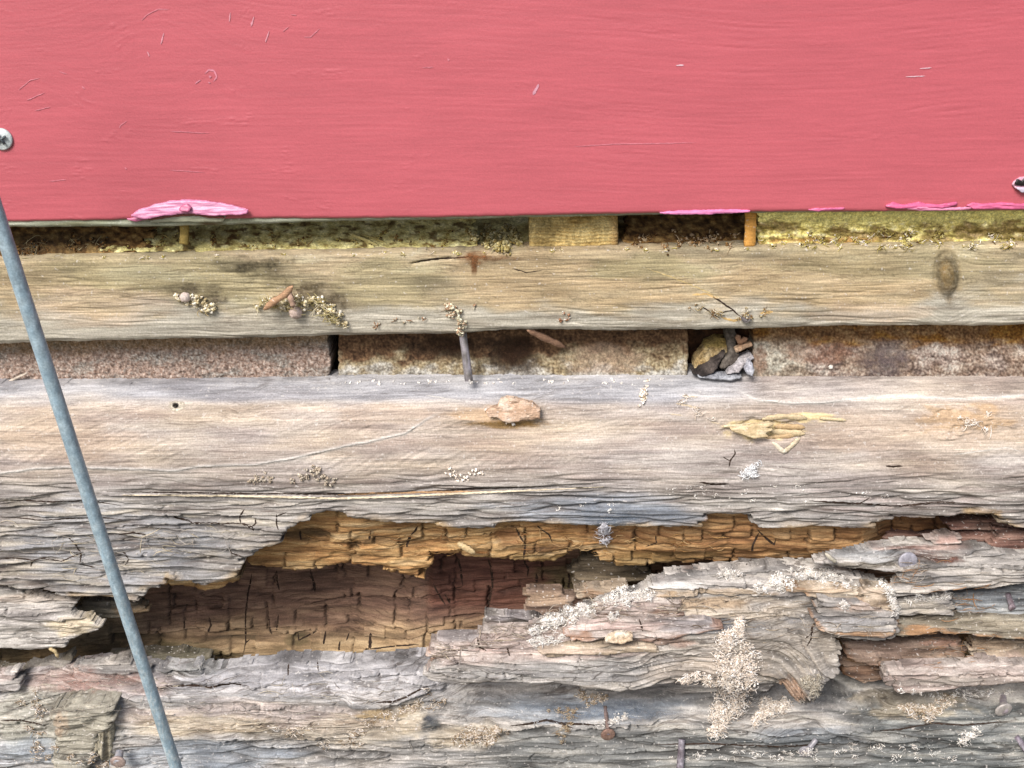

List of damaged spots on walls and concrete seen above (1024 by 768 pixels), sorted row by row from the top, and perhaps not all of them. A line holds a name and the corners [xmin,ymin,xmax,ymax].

peeling [885,177,1024,211]
corrosion [466,252,501,272]
crack [1,485,596,568]
crack [228,549,510,671]
peeling [605,630,633,644]